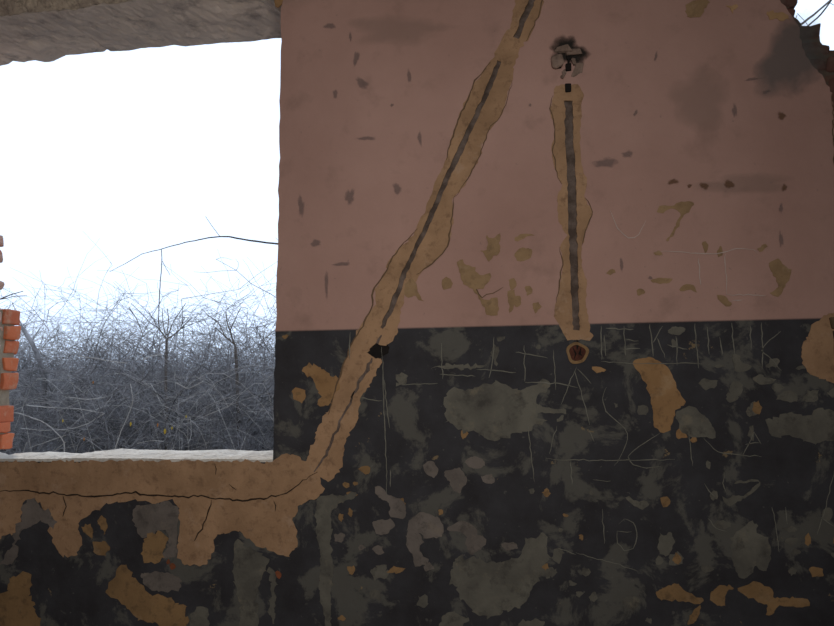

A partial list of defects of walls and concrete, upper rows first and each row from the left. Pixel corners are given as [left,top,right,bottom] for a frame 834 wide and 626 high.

spalling [780,0,798,18]
spalling [799,23,834,118]
peeling [769,258,792,297]
flaking render [0,308,21,450]
peeling [633,357,718,443]
crack [0,466,317,541]
spalling [0,343,382,626]